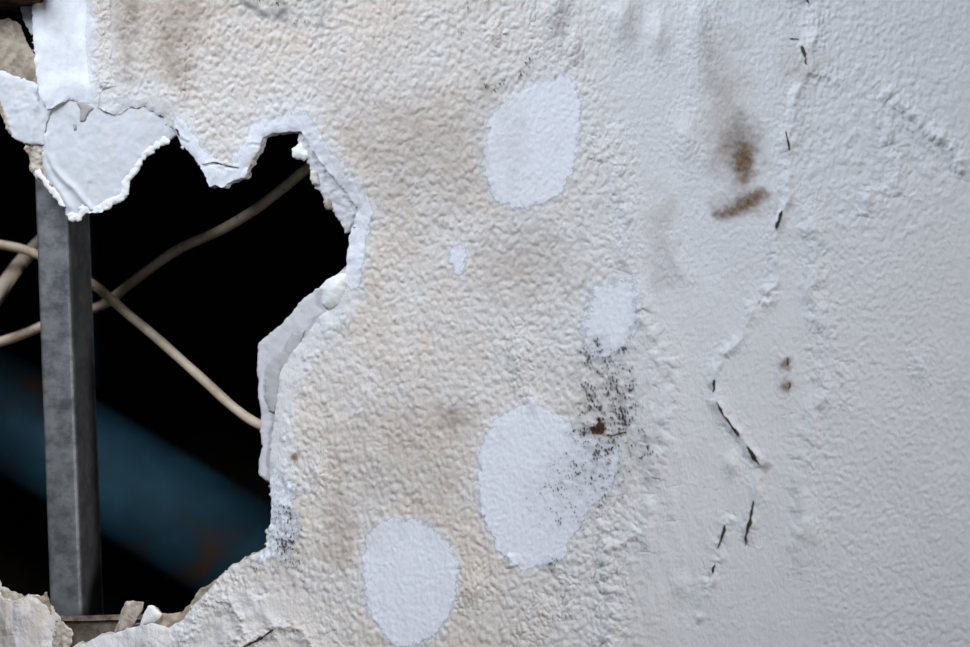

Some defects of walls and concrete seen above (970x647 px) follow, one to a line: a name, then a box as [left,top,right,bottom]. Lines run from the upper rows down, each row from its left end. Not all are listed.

peeling [20,0,117,115]
flaking render [24,144,66,207]
peeling [165,110,373,301]
rust [713,189,765,216]
rust [735,144,753,182]
crack [851,75,970,220]
crack [689,0,847,620]
peeling [222,466,299,575]
spalling [0,581,61,631]
flaking render [73,600,174,647]